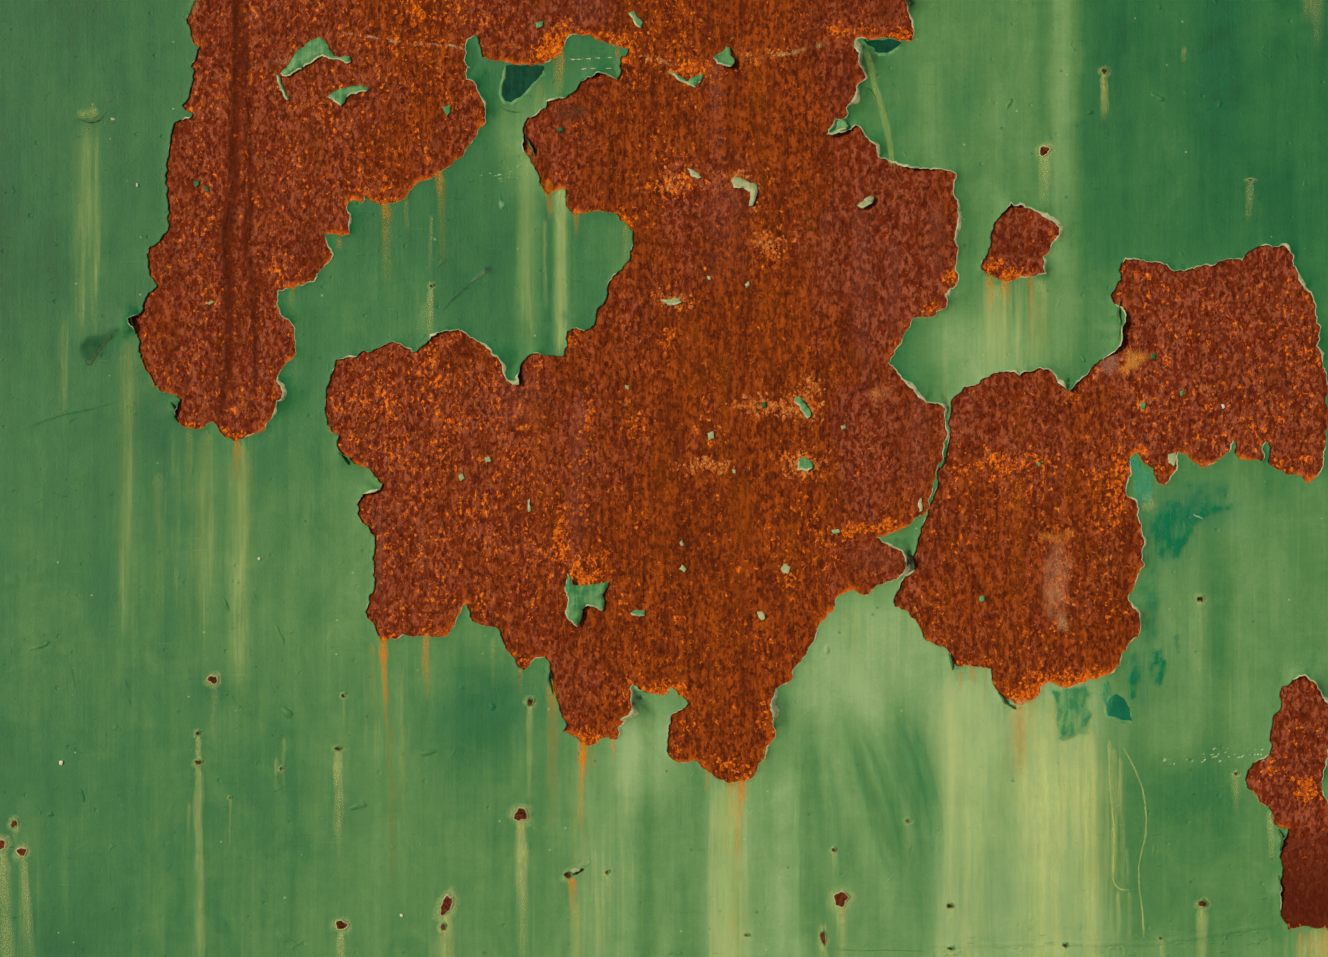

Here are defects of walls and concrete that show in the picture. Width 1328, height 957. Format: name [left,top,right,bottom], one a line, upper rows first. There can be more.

peeling [862,39,901,56]
peeling [499,64,545,105]
peeling [833,119,849,132]
corrosion [127,0,1328,783]
peeling [1152,503,1229,557]
peeling [1052,669,1139,737]
corrosion [513,806,529,822]
corrosion [0,819,28,857]
corrosion [440,894,454,931]
corrosion [833,890,850,908]